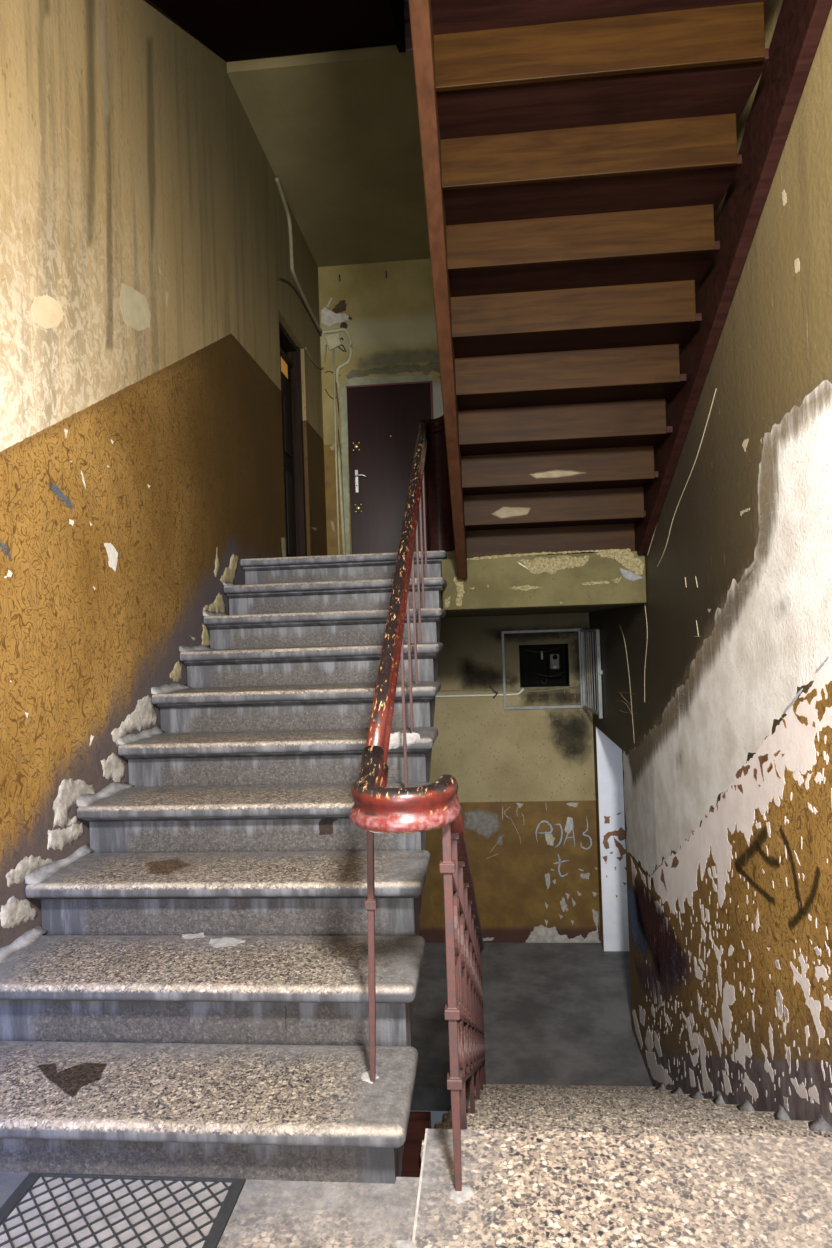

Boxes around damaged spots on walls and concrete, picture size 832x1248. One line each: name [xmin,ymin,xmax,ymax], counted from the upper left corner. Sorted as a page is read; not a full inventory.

damp [346,351,440,379]
peeling [104,543,118,571]
spalling [467,534,654,591]
spalling [190,547,239,646]
spalling [169,661,183,682]
flaking render [525,380,832,1113]
spalling [0,695,158,929]